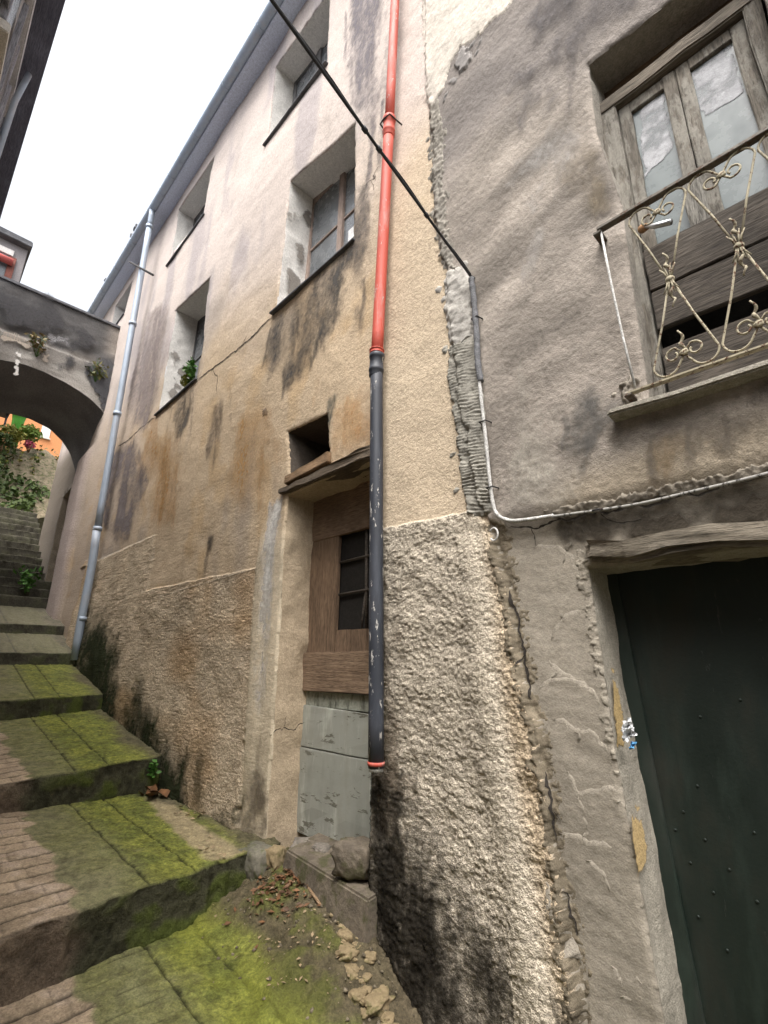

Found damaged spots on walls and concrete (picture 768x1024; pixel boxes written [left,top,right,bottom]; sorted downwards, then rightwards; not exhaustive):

damp [350,0,383,105]
flaking render [421,0,513,270]
damp [268,185,369,386]
crack [198,319,269,392]
damp [104,444,147,536]
crack [508,590,532,700]
damp [73,609,198,804]
crack [545,772,561,841]
damp [368,772,514,1024]
crack [562,891,578,935]